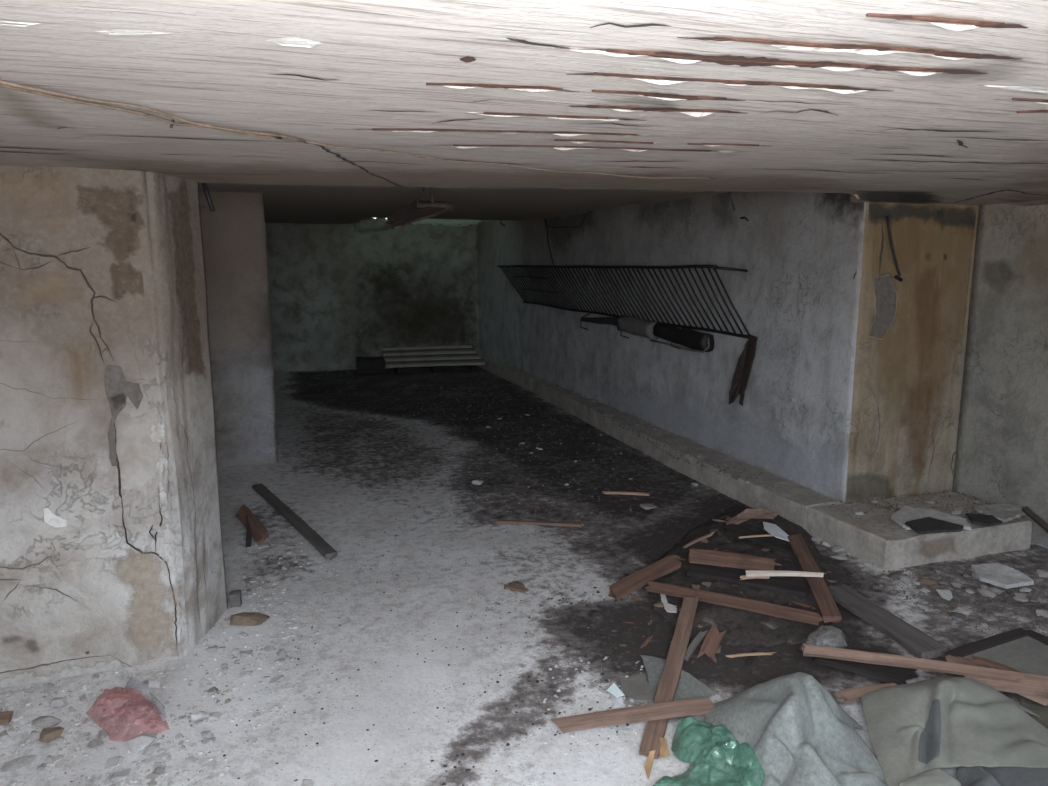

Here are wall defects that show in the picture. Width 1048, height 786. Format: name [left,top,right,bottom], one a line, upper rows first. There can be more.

crack [507,38,568,48]
crack [590,21,668,29]
crack [273,73,329,81]
crack [375,100,487,124]
crack [754,100,843,116]
crack [311,143,461,188]
peeling [78,187,144,299]
crack [0,227,118,362]
peeling [868,273,898,341]
flaking render [104,363,147,469]
crack [114,401,207,659]
crack [0,554,79,603]